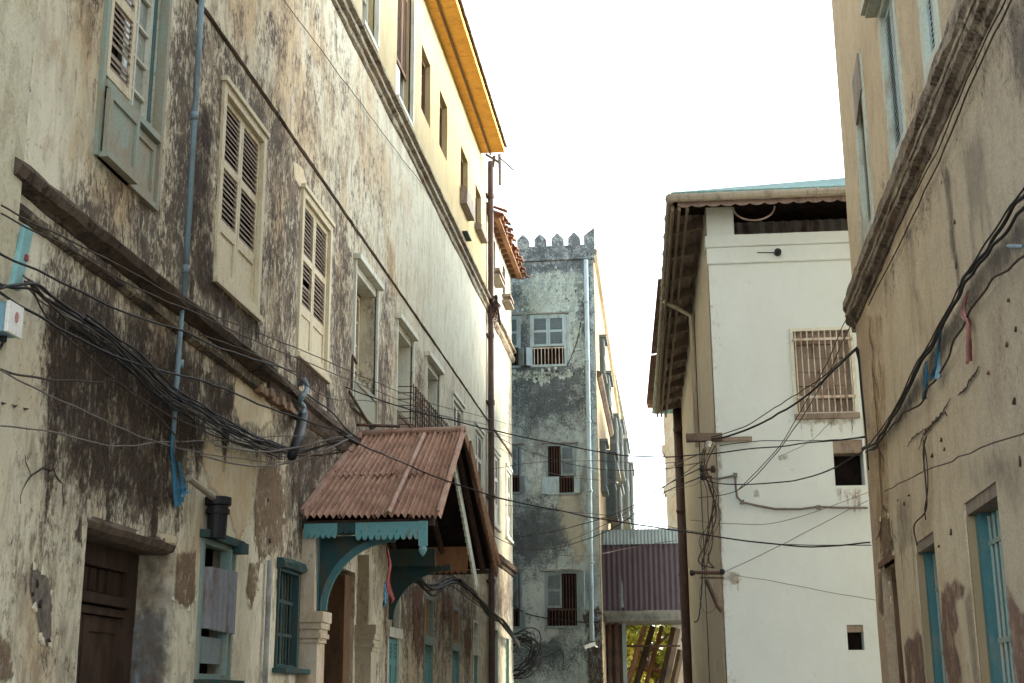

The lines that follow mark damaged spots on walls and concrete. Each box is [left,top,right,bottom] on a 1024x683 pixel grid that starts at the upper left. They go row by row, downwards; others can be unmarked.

damp [190,105,261,349]
damp [43,282,234,543]
crack [907,366,979,470]
flaking render [30,562,53,649]
crack [20,455,64,505]
flaking render [160,533,196,612]
peeling [202,438,285,609]
peeling [941,580,964,683]